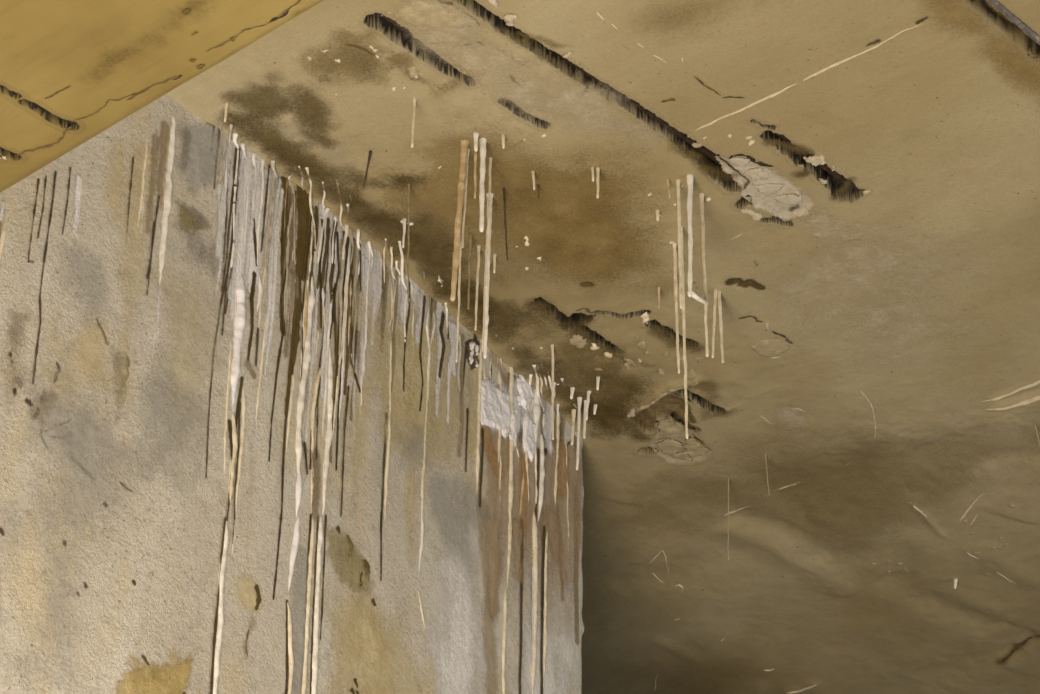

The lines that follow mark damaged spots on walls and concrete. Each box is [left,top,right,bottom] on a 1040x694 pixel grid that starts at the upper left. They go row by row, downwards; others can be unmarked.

damp [311,34,379,81]
spalling [346,0,873,230]
damp [28,167,83,385]
damp [110,115,220,421]
damp [227,87,652,694]
crack [576,307,656,324]
spalling [524,295,732,468]
damp [210,342,246,694]
rust [481,425,583,620]
crack [1003,637,1032,661]